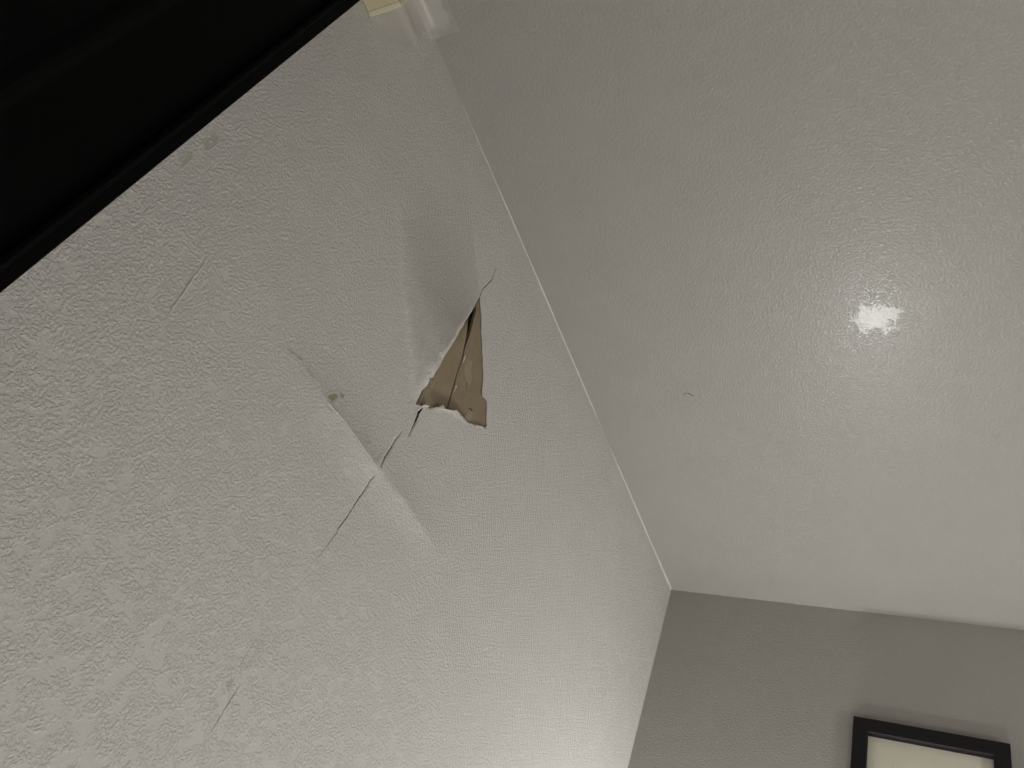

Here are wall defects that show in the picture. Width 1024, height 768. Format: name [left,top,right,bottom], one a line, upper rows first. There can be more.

crack [319,408,423,556]